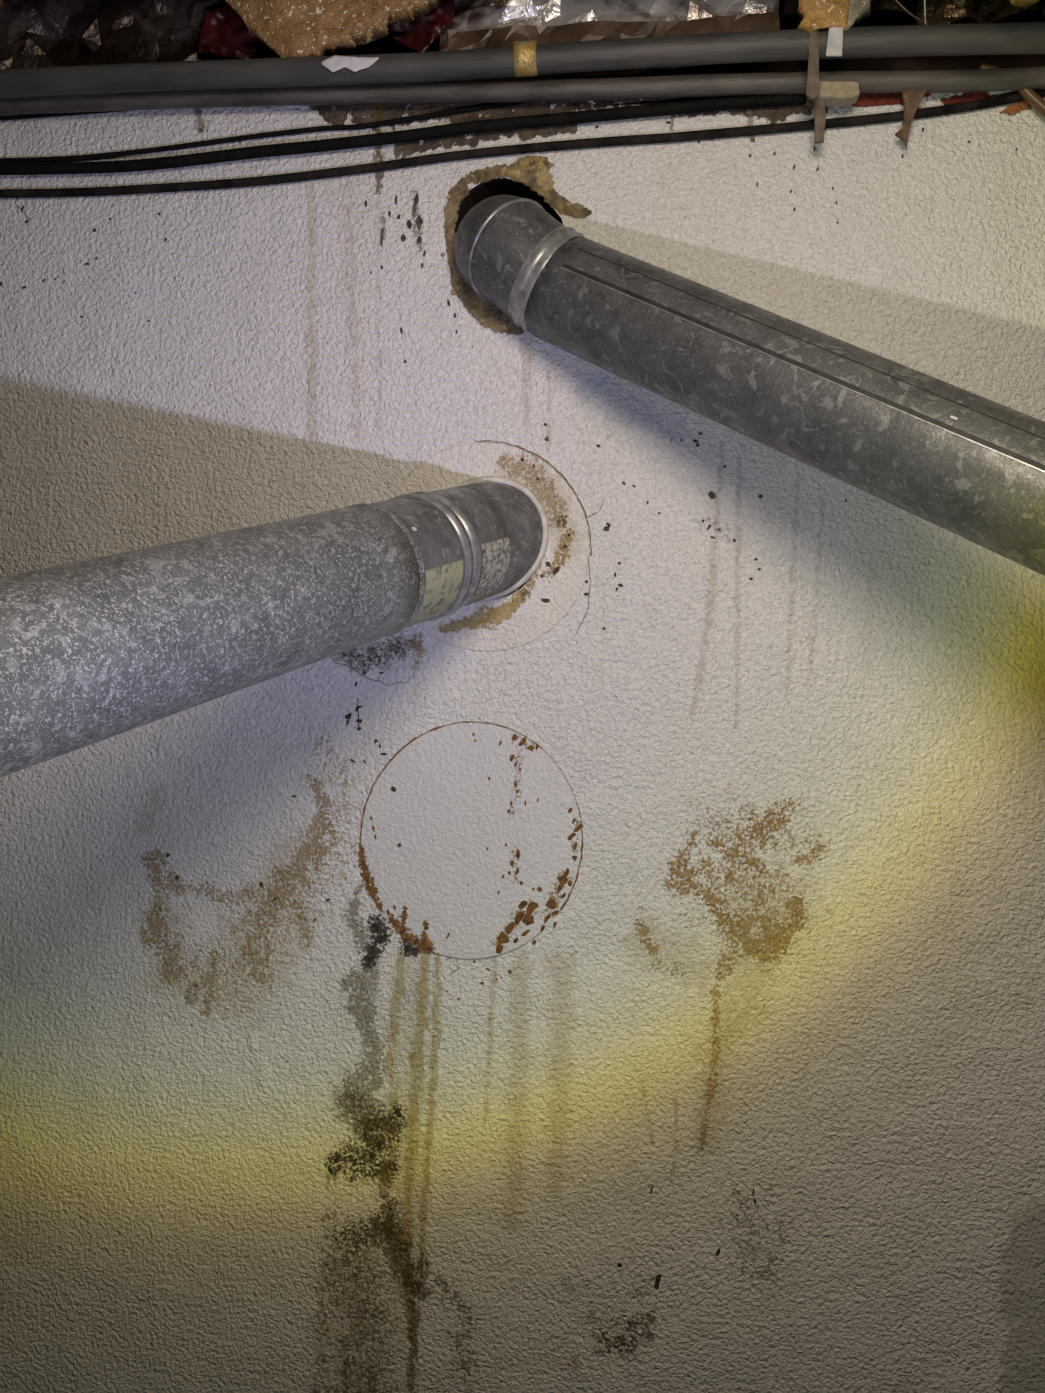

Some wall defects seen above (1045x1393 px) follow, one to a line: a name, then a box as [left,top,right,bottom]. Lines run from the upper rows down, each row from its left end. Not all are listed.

corrosion [439,563,542,633]
corrosion [499,734,539,814]
water stain [141,736,366,1017]
corrosion [358,816,450,954]
corrosion [493,808,583,954]
water stain [314,884,477,1393]